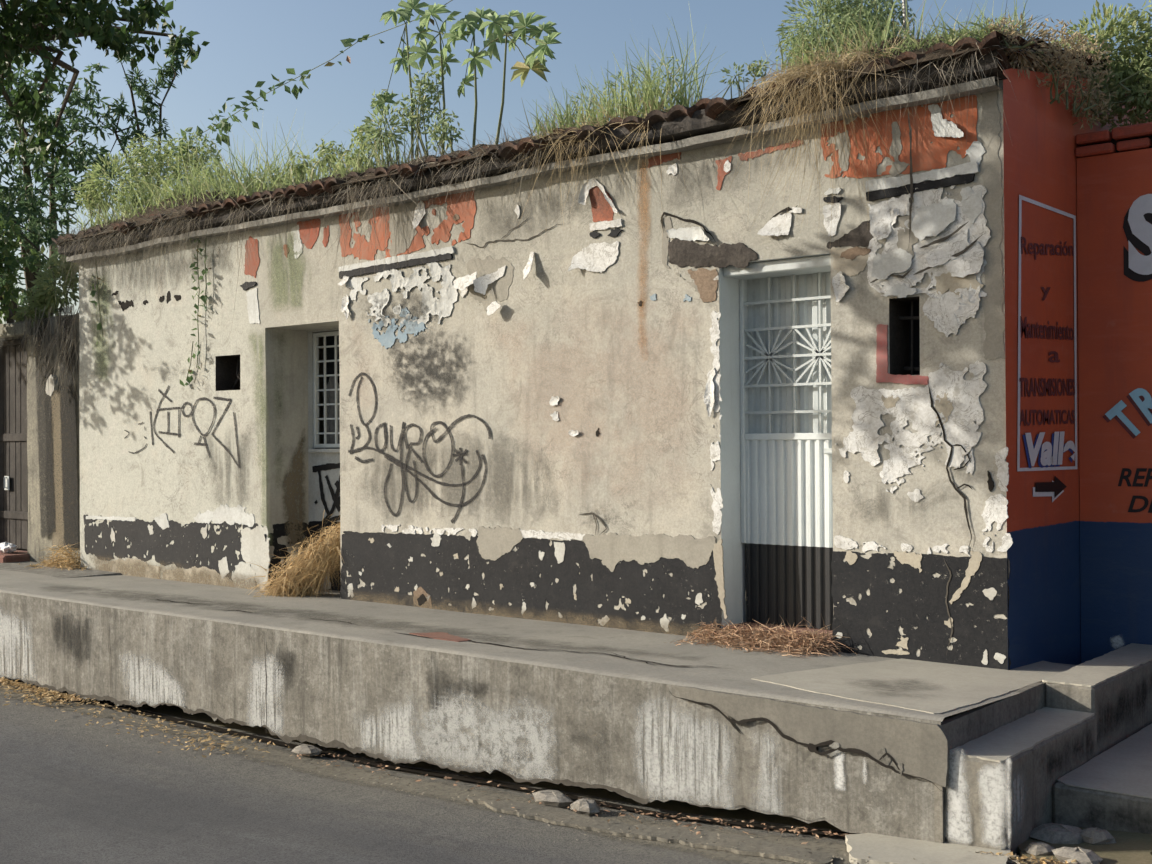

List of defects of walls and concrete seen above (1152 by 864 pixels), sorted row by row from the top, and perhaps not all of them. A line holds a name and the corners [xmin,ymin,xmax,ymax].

peeling [322,190,534,349]
crack [467,219,563,248]
flaking render [568,178,623,273]
peeling [757,206,803,236]
leakage [391,334,467,400]
peeling [821,85,1013,628]
flaking render [368,212,758,619]
peeling [86,504,302,590]
crack [927,380,973,654]
flaking render [660,614,686,632]
peeling [882,636,910,655]
peeling [981,650,1006,665]